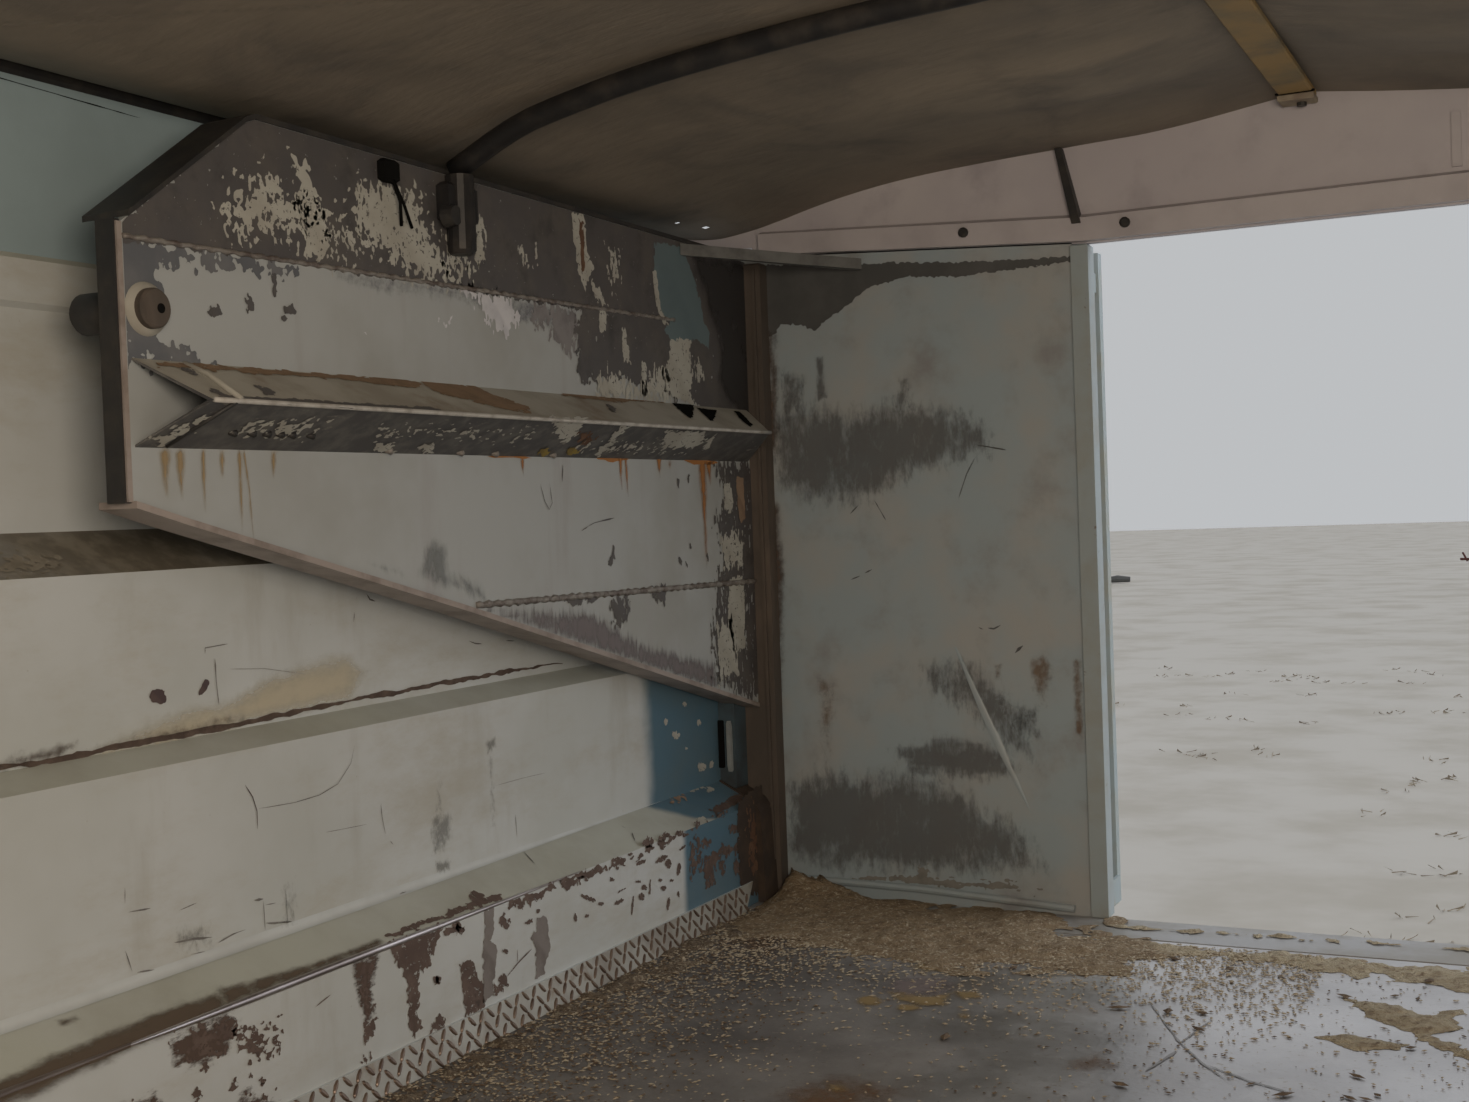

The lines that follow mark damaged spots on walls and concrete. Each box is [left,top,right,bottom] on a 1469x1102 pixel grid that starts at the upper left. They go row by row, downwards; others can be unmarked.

peeling [122,120,745,409]
rust [162,450,183,486]
peeling [148,415,211,447]
rust [202,451,252,514]
peeling [230,416,334,443]
rust [685,460,718,543]
peeling [373,415,759,700]
peeling [149,689,167,704]
rust [737,785,764,896]
peeling [0,761,744,1102]